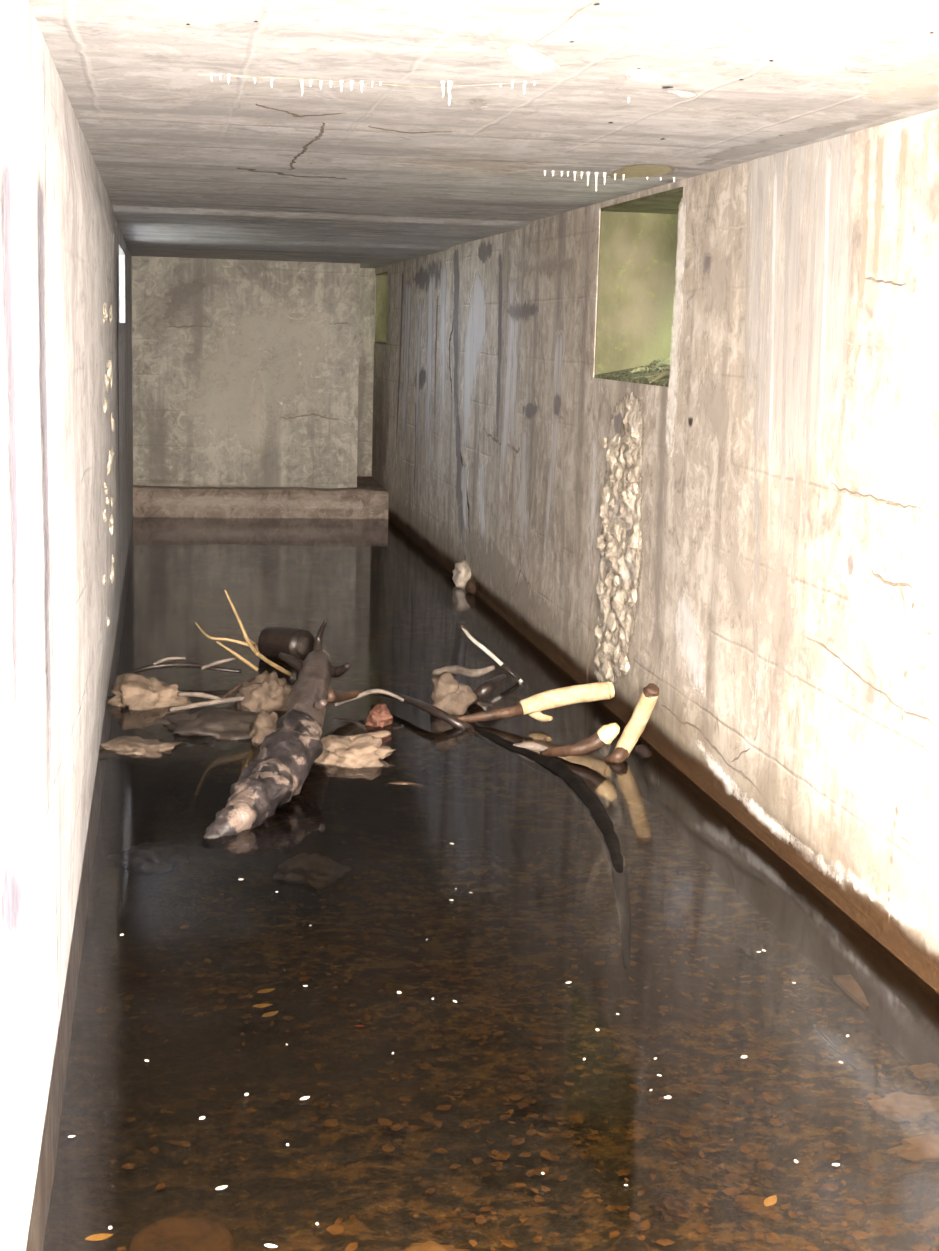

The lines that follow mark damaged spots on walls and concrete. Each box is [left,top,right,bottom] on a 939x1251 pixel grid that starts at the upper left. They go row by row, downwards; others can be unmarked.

crack [198,74,522,179]
damp [396,261,446,481]
damp [464,242,539,541]
damp [701,112,907,681]
damp [389,515,455,580]
damp [467,583,596,686]
damp [592,698,633,730]
spalling [593,392,643,683]
crack [801,633,939,727]
crack [831,483,920,508]
crack [872,571,912,615]
damp [637,724,939,1007]